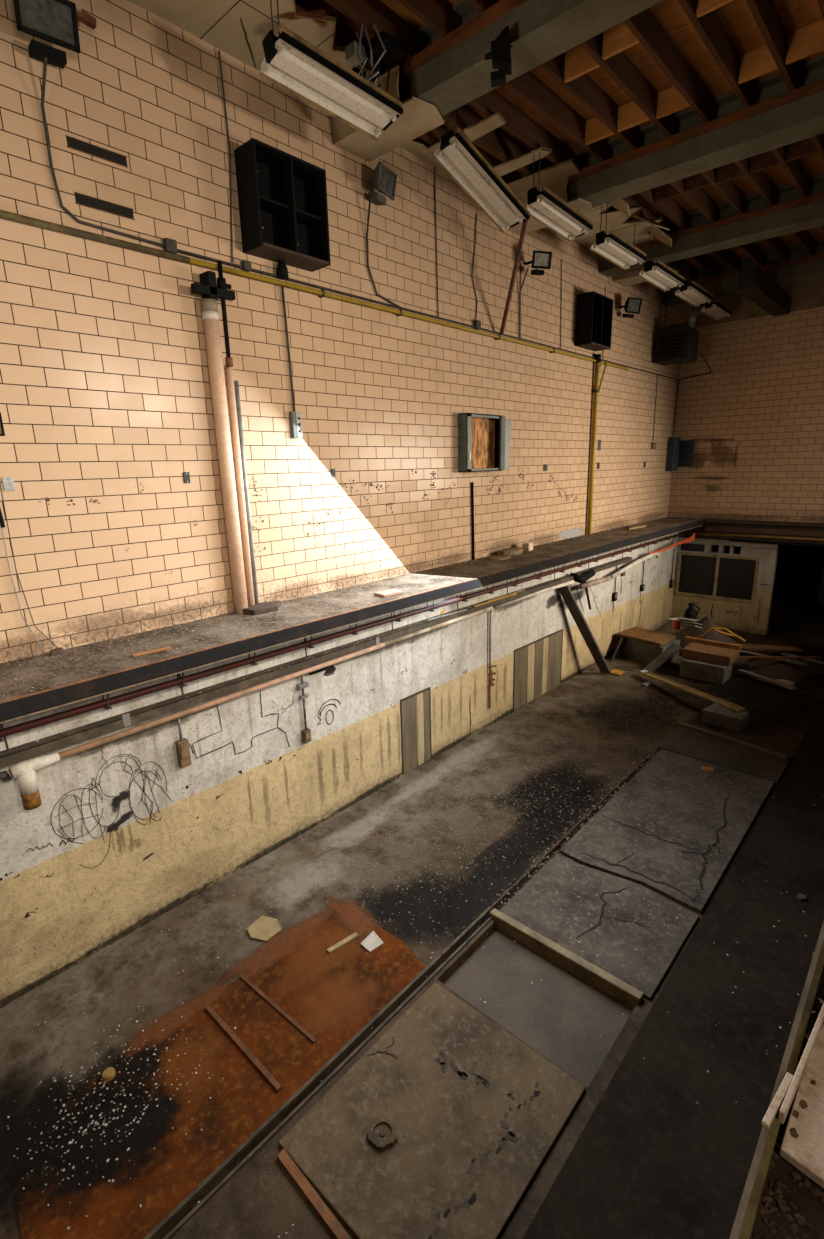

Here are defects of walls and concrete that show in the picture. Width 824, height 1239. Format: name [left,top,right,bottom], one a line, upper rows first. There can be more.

leakage [239,697,534,904]
crack [576,790,731,939]
corrosion [129,900,377,1090]